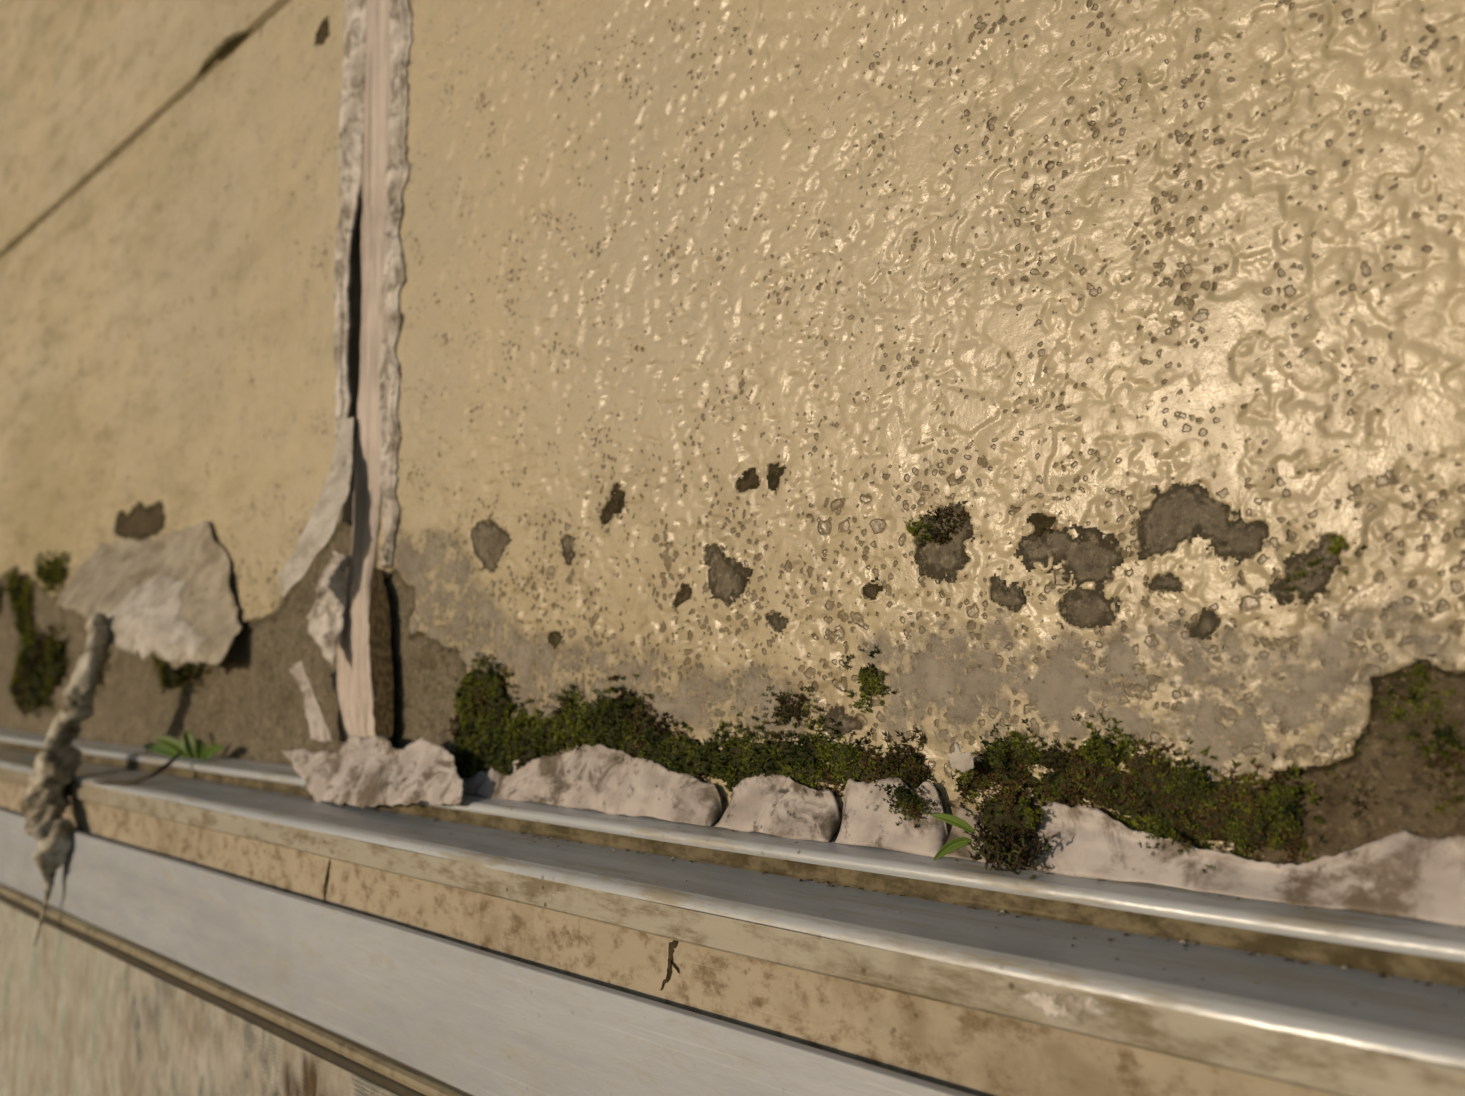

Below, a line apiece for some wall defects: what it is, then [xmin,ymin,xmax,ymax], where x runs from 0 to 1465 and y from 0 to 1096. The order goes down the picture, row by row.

spalling [0,417,354,766]
spalling [383,570,467,754]
peeling [471,516,512,572]
peeling [598,483,627,525]
peeling [673,543,753,608]
peeling [736,462,786,493]
peeling [913,501,980,585]
peeling [990,482,1269,629]
leakage [867,598,1443,777]
peeling [1184,607,1221,643]
peeling [1269,534,1349,611]
spalling [1235,654,1465,865]